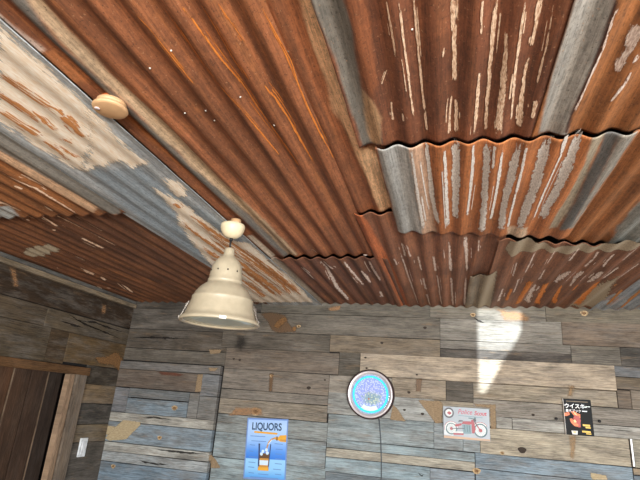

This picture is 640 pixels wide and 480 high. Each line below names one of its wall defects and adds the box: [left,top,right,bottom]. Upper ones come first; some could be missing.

rust [0,74,90,160]
peeling [0,24,149,172]
rust [167,5,299,165]
rust [262,8,334,160]
peeling [442,0,458,80]
peeling [470,0,543,134]
peeling [410,141,461,228]
peeling [467,129,583,232]
peeling [154,177,313,303]
rust [182,216,301,297]
rust [477,271,498,307]
rust [505,237,640,257]